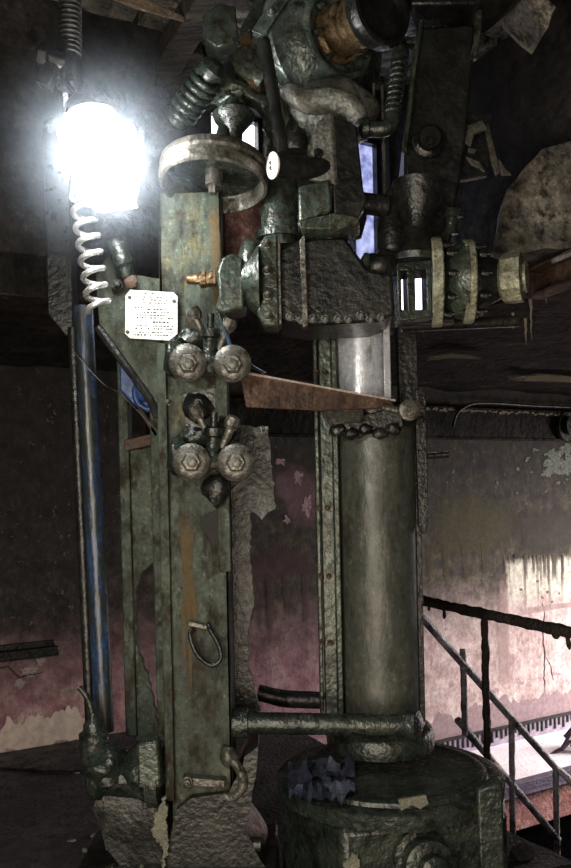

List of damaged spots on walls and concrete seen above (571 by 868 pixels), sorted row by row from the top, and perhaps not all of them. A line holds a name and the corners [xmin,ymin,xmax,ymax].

peeling [516,443,571,485]
leakage [520,512,571,612]
flaking render [14,657,45,689]
flaking render [0,688,85,752]